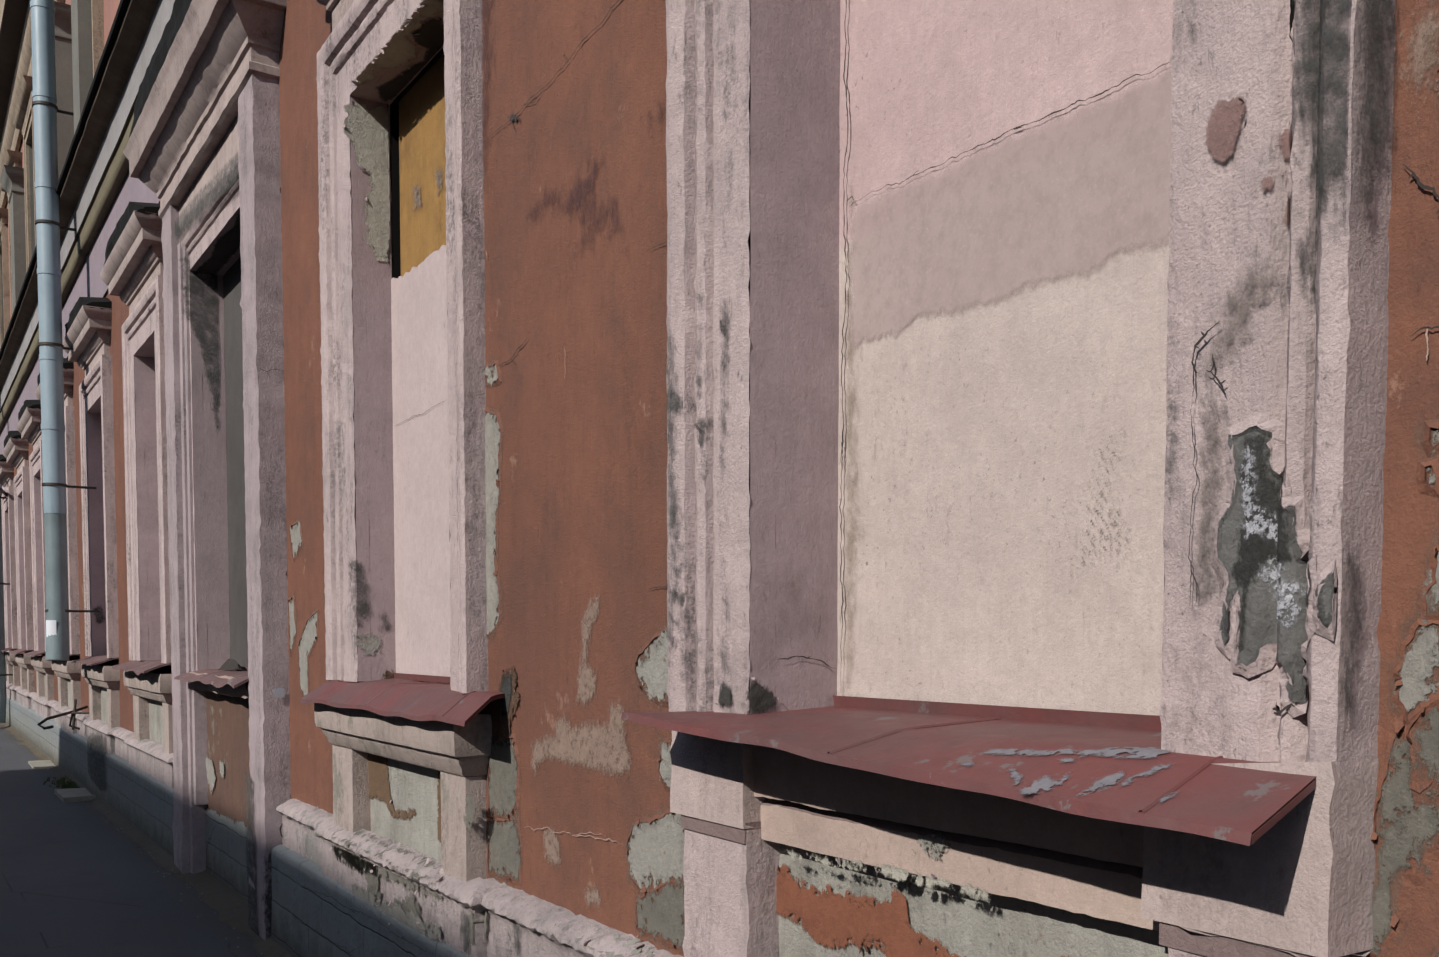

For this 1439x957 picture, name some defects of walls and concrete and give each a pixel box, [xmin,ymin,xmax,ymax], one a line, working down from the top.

damp [175,153,238,238]
peeling [343,0,444,262]
damp [1292,0,1397,293]
crack [1403,164,1439,214]
damp [182,212,240,428]
damp [348,560,391,631]
crack [1188,321,1226,606]
spalling [1209,414,1337,718]
peeling [463,666,631,886]
peeling [576,735,685,957]
peeling [776,832,990,957]
peeling [1364,538,1439,957]